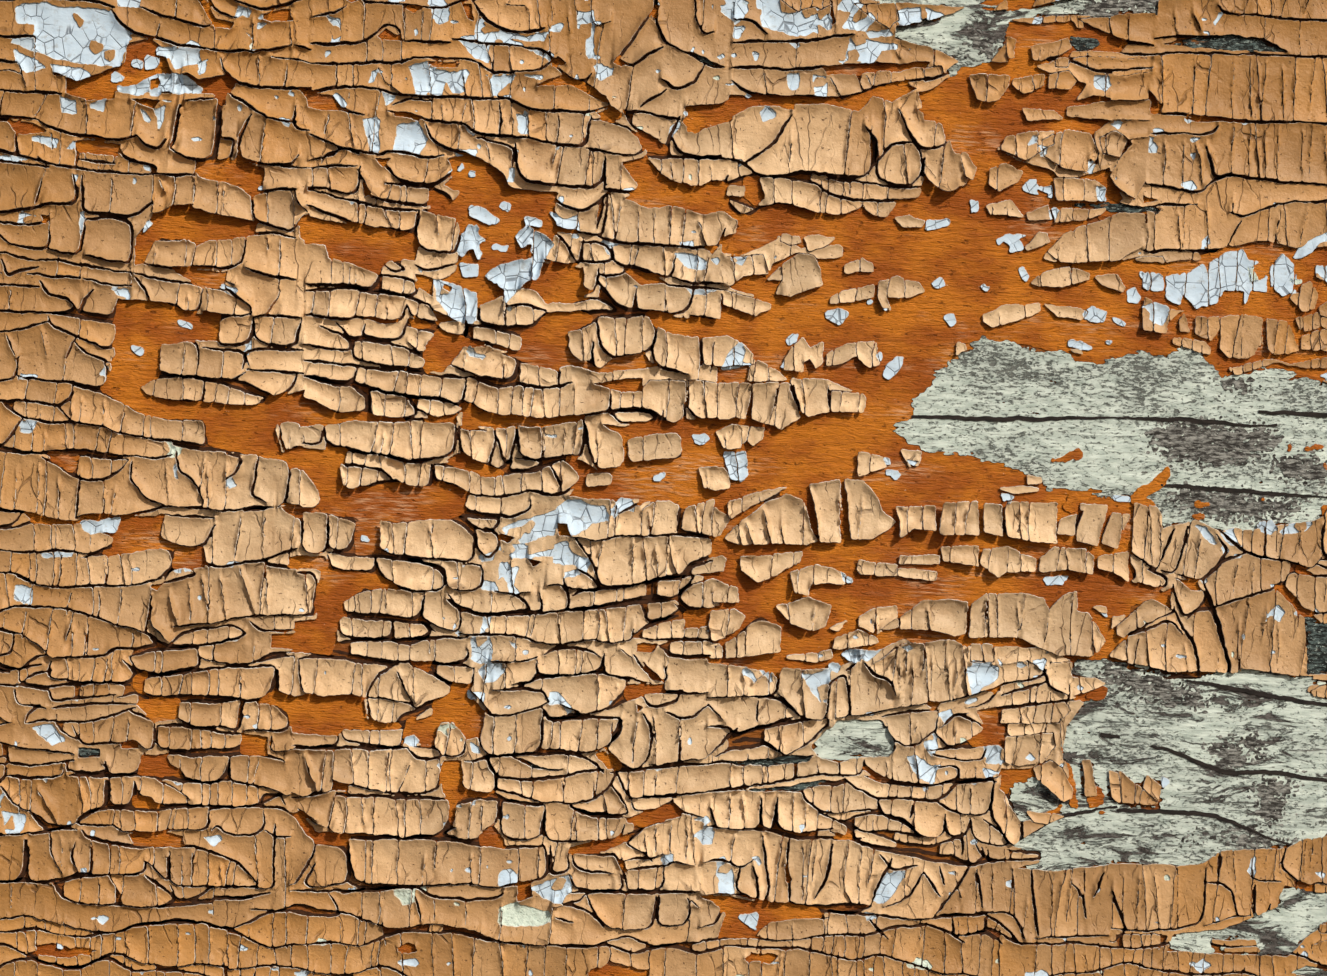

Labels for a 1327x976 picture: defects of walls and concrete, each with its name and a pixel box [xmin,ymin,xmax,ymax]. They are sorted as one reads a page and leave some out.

crack [312,25,551,83]
crack [732,73,947,99]
crack [1153,0,1327,186]
crack [0,136,161,213]
peeling [568,313,755,386]
peeling [465,361,739,472]
peeling [725,479,843,545]
peeling [983,486,1108,546]
crack [462,583,674,638]
peeling [996,669,1105,802]
crack [348,839,550,888]
peeling [1169,887,1327,976]